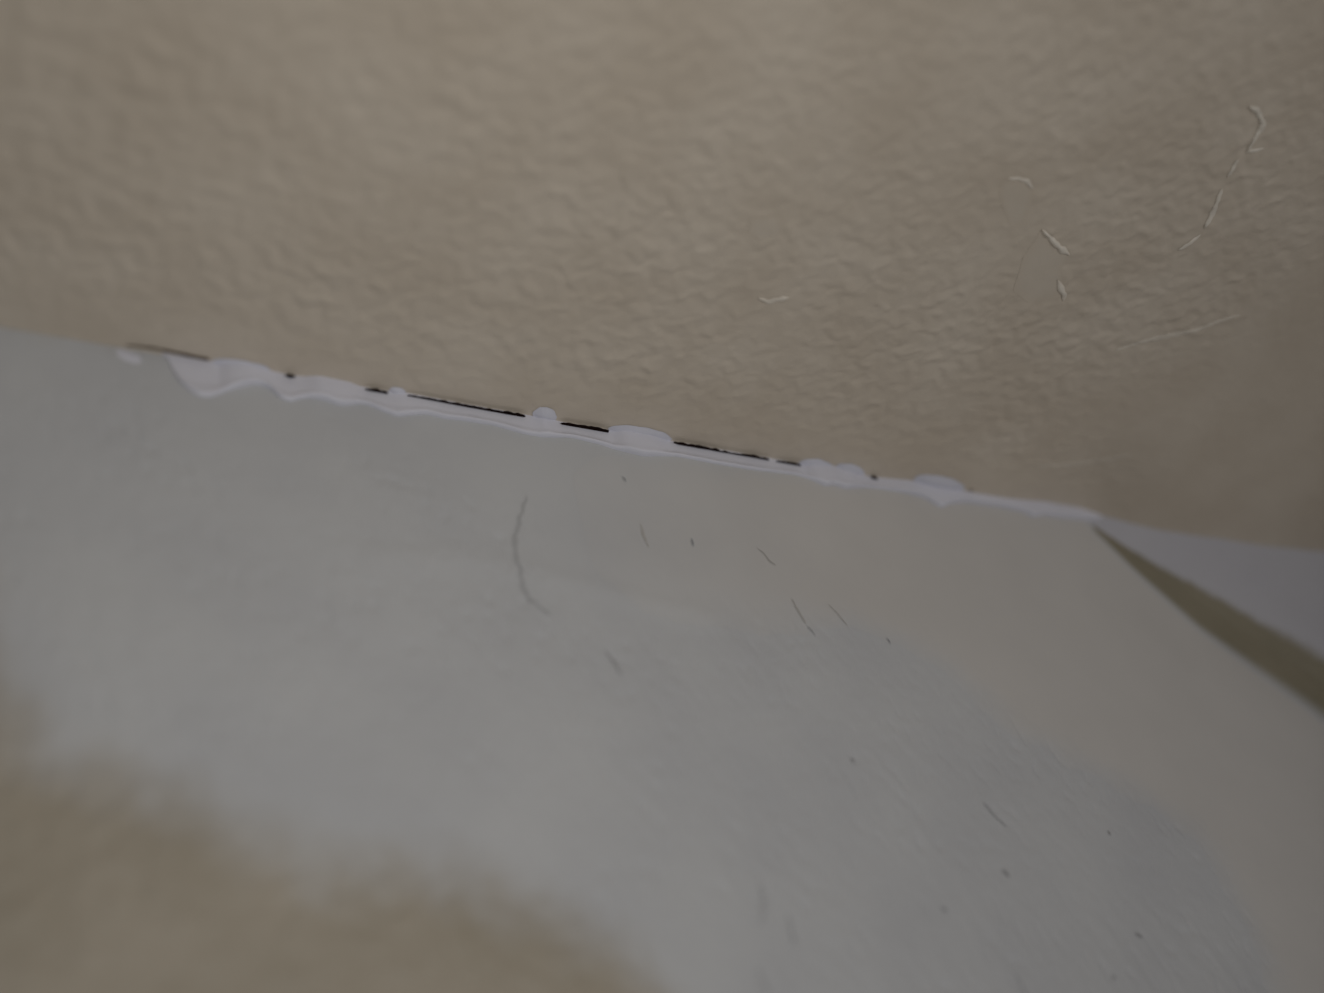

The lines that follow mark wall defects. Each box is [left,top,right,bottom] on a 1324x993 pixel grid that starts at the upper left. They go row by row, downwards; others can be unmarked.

crack [126,345,211,361]
crack [365,388,525,417]
crack [561,422,609,433]
crack [674,442,801,466]